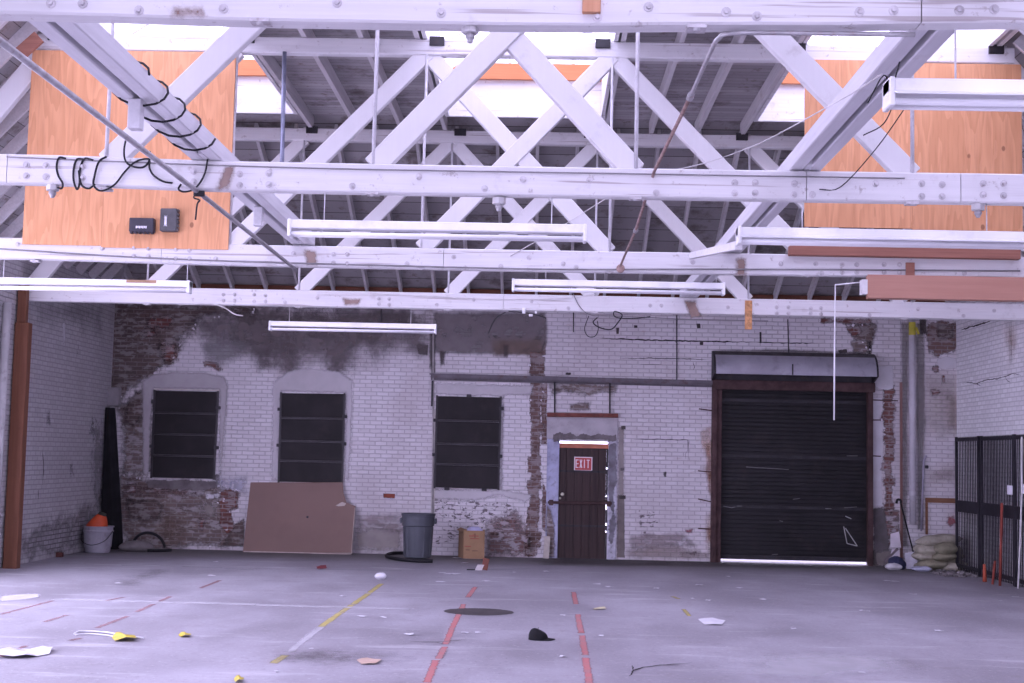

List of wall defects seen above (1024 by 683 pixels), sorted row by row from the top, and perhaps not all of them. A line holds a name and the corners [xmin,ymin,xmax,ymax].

leakage [418,312,547,373]
peeling [820,318,877,354]
peeling [919,319,956,396]
crack [966,373,1021,386]
peeling [111,304,257,549]
flaking render [435,341,626,558]
flaking render [880,387,900,545]